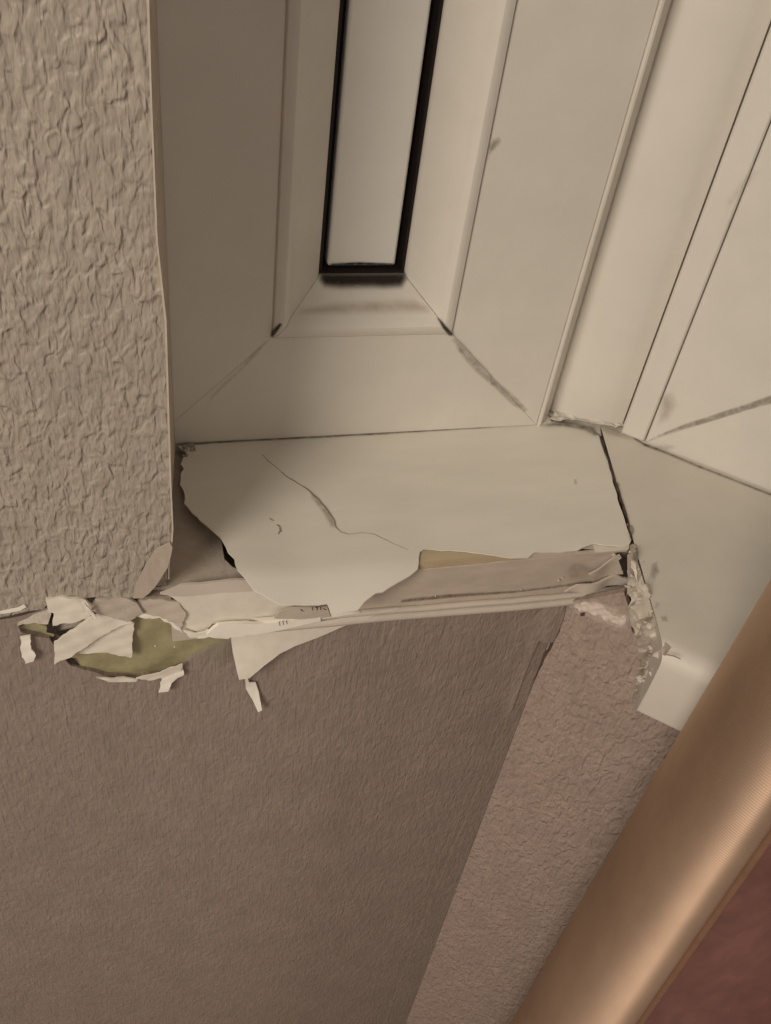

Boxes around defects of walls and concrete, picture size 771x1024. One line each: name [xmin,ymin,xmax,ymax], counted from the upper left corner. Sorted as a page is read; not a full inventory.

crack [262,454,408,550]
crack [600,436,634,541]
spalling [18,595,230,693]
spalling [572,544,671,714]